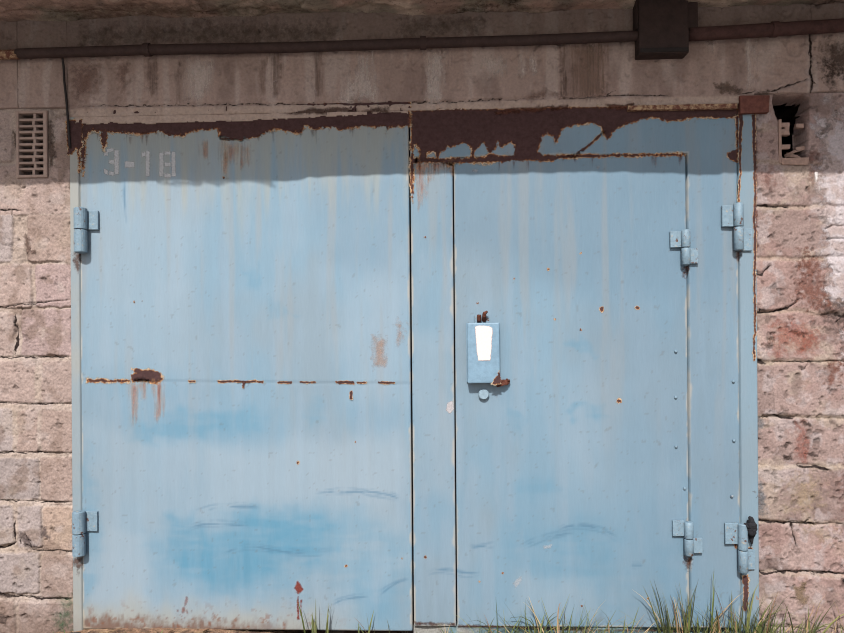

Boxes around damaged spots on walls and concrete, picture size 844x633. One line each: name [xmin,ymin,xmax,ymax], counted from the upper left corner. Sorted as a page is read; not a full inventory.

crack [743,34,815,94]
spalling [290,107,357,115]
spalling [495,105,568,114]
corrosion [64,101,758,361]
corrosion [86,368,165,395]
corrosion [217,379,264,388]
corrosion [335,380,367,400]
crack [758,519,816,544]
crack [759,568,840,576]
corrosion [742,574,750,611]